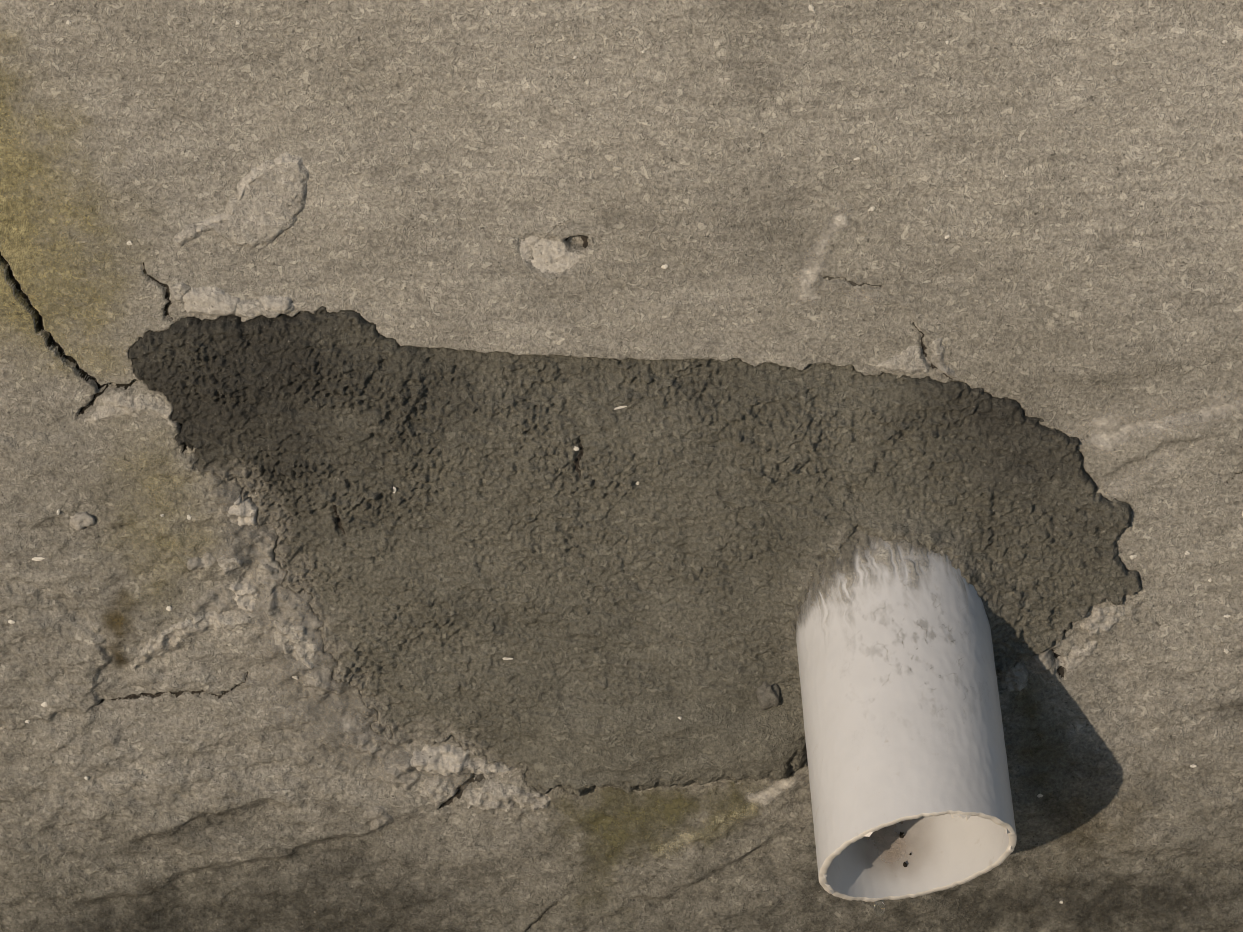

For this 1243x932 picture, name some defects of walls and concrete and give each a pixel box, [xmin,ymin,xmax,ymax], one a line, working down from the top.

leakage [0,101,103,333]
hole [516,220,588,280]
crack [143,262,173,320]
peeling [169,282,294,319]
crack [0,251,137,416]
crack [97,671,249,705]
spalling [353,737,552,812]
leakage [577,786,699,863]
leakage [710,778,801,829]